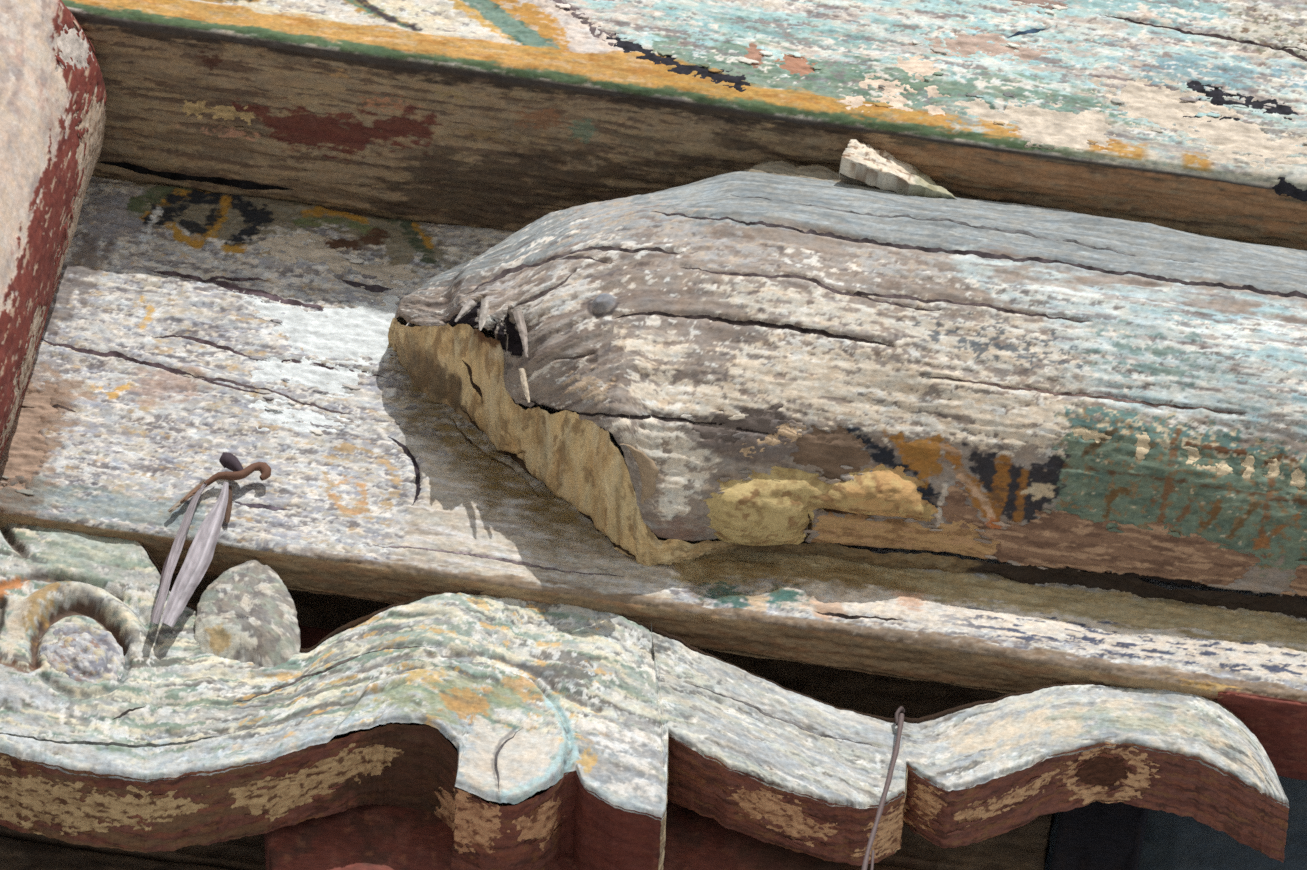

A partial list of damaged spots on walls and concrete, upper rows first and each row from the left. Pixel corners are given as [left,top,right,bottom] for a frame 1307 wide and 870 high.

peeling [837,26,1307,171]
peeling [0,85,106,495]
crack [616,311,895,347]
crack [466,246,1088,322]
crack [651,195,1307,298]
crack [42,334,388,414]
crack [926,376,1245,414]
crack [374,360,637,576]
peeling [681,403,1267,586]
peeling [0,756,210,838]
peeling [226,743,404,822]
peeling [434,787,565,854]